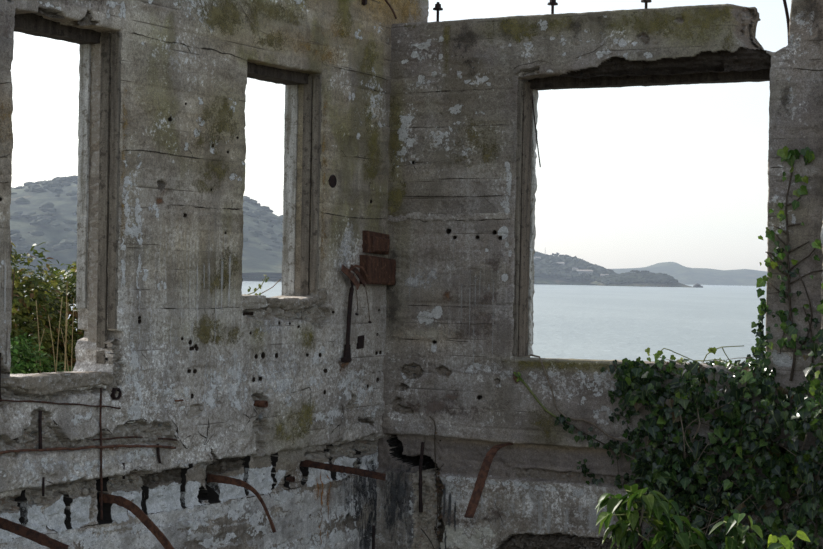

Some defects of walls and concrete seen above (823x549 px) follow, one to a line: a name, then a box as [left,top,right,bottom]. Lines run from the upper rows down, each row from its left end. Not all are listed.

damp [196,0,344,62]
spalling [515,7,771,79]
damp [599,6,734,50]
peeling [0,335,379,549]
damp [339,455,411,549]
spalling [409,468,631,549]